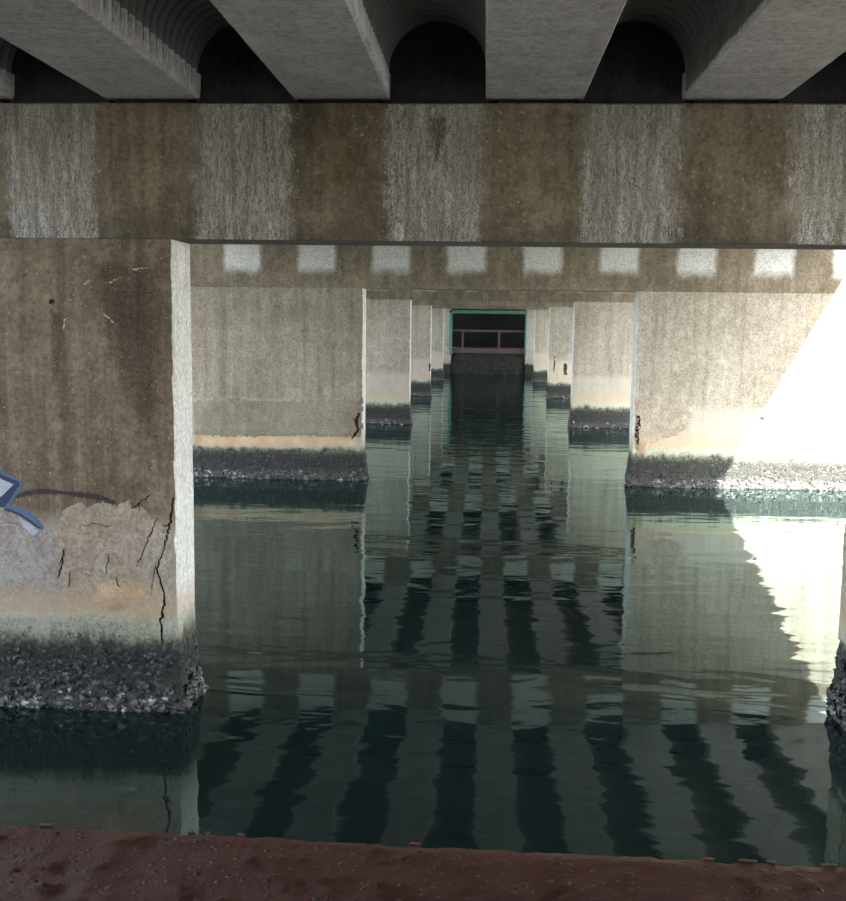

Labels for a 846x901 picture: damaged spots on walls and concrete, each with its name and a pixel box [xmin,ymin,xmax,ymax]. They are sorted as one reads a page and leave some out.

damp [562,104,702,243]
damp [770,105,846,245]
crack [58,549,71,587]
spalling [0,500,175,650]
crack [132,494,175,645]